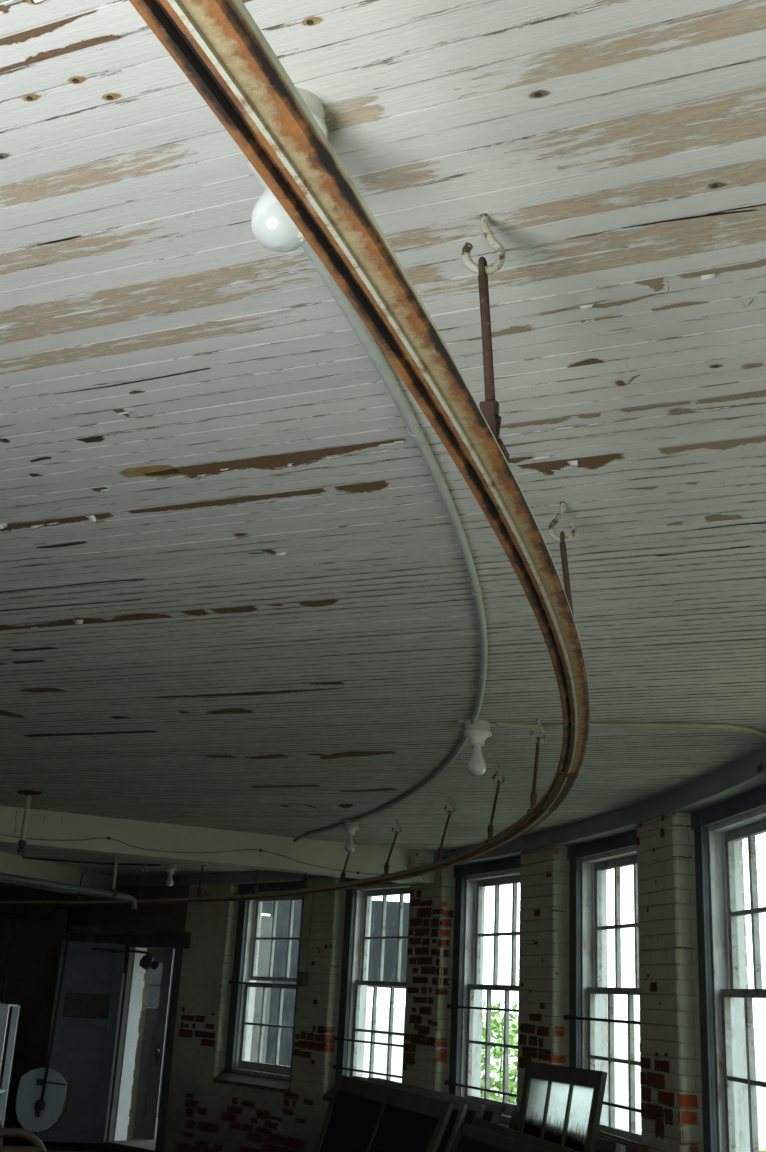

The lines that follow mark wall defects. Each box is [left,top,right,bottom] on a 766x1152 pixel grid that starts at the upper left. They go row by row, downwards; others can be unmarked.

peeling [505,0,766,90]
peeling [513,86,766,172]
peeling [385,160,766,253]
peeling [406,203,766,296]
peeling [545,277,710,323]
peeling [175,438,406,479]
peeling [507,453,625,477]
peeling [658,436,766,455]
peeling [0,599,339,631]
peeling [403,890,454,1071]
peeling [517,983,566,1069]
peeling [640,1044,699,1152]